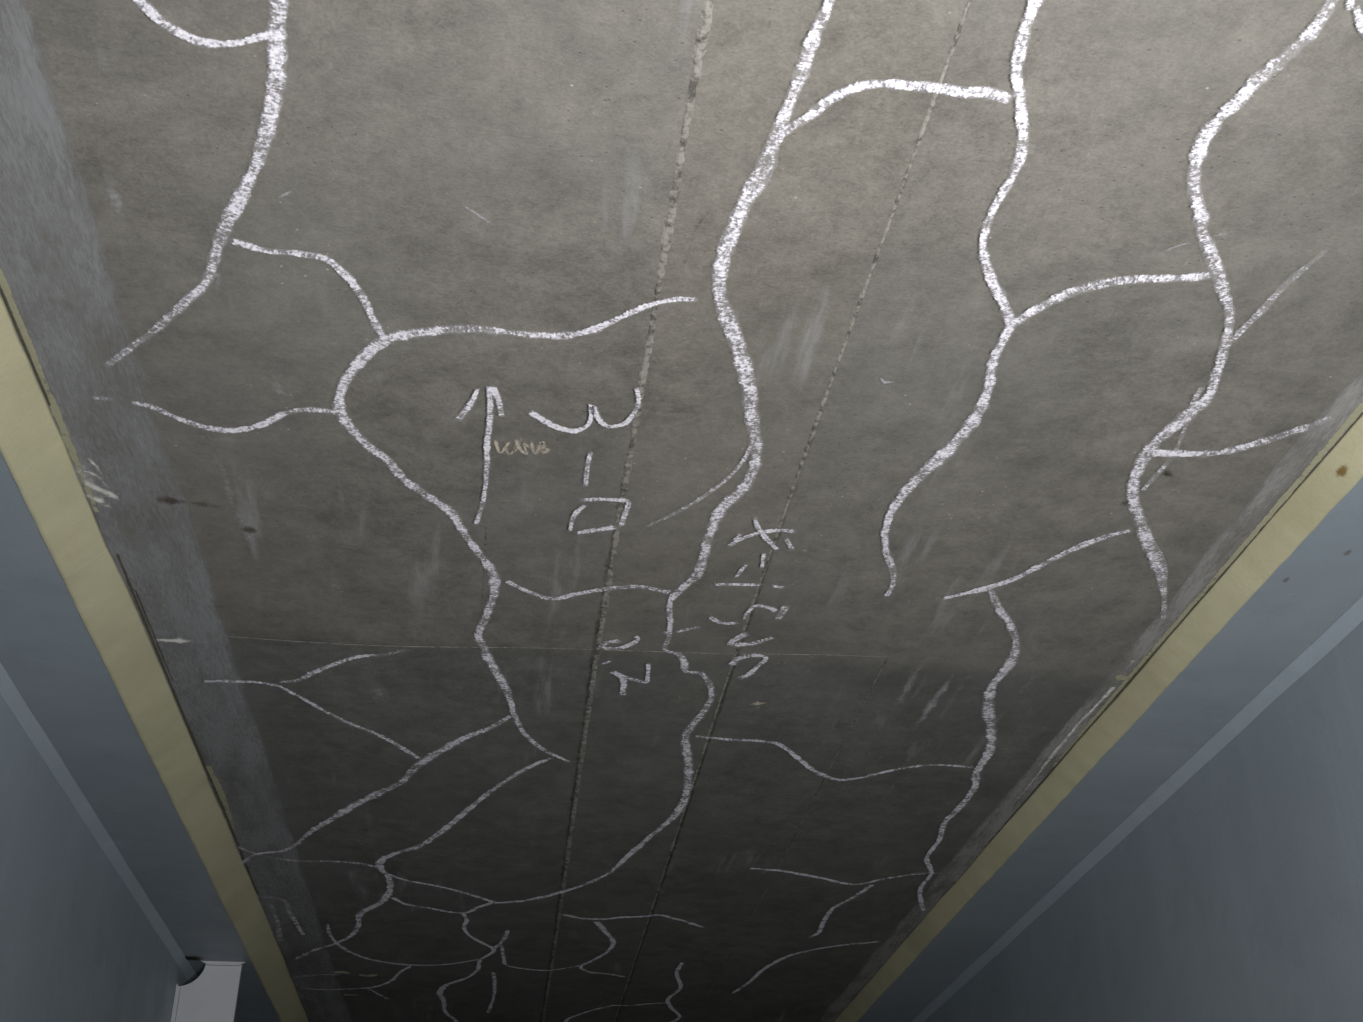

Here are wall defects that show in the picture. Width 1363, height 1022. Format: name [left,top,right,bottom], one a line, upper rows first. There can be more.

crack [1291,3,1335,49]
crack [1347,0,1363,33]
crack [114,0,287,361]
crack [134,239,452,490]
crack [205,0,1284,1022]
crack [1285,425,1308,436]